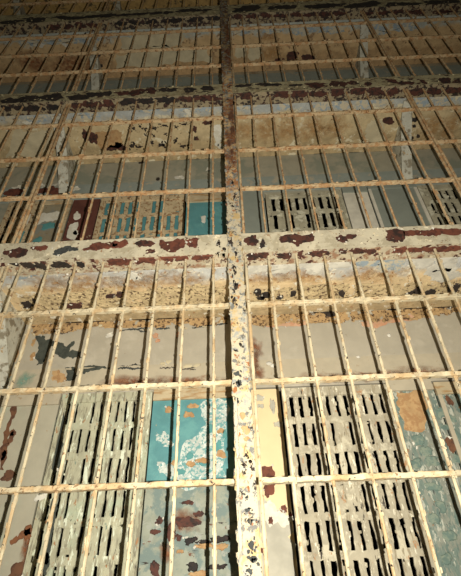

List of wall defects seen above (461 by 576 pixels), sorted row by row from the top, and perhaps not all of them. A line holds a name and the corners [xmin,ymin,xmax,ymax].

peeling [232,0,460,36]
peeling [0,86,234,158]
peeling [228,77,461,134]
peeling [3,211,239,281]
spalling [20,265,238,311]
peeling [30,317,228,365]
peeling [51,408,66,475]
peeling [396,390,441,470]
peeling [436,407,461,463]
peeling [150,394,297,576]
corrosion [10,524,32,557]
peeling [34,493,58,576]